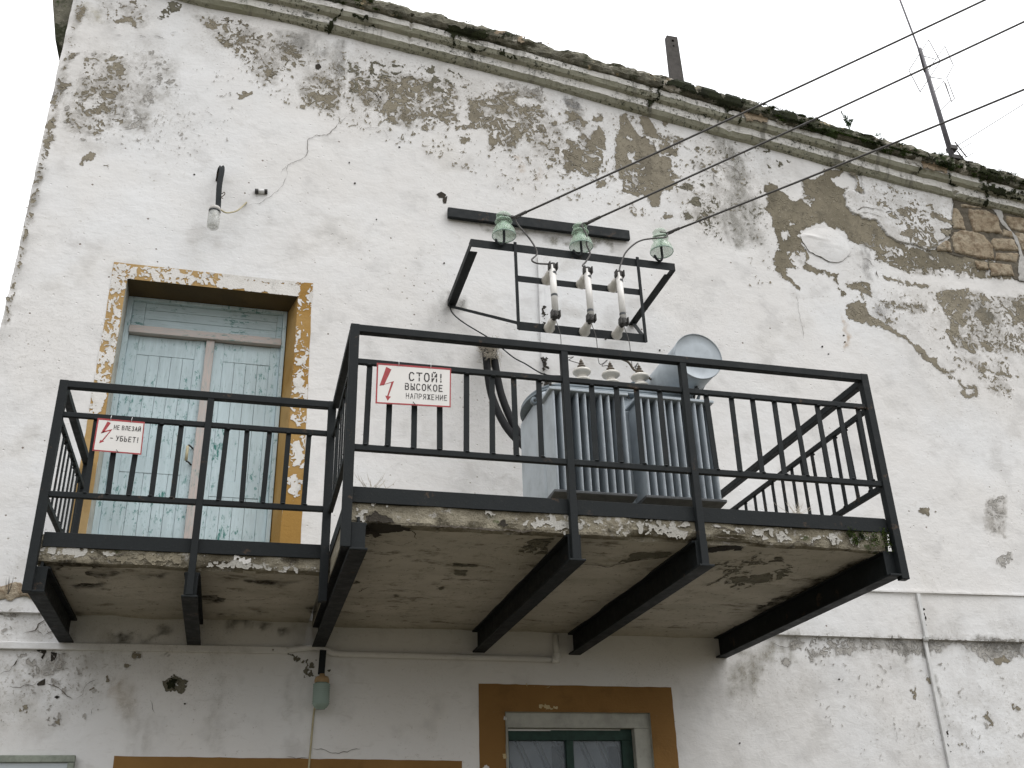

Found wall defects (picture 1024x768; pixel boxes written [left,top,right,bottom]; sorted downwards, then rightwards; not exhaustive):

peeling [5,0,212,321]
crack [250,116,347,205]
peeling [200,16,1024,399]
peeling [89,263,313,497]
peeling [199,554,317,573]
spalling [356,503,410,538]
peeling [519,513,690,555]
spalling [707,524,873,589]
peeling [12,650,110,727]
flaking render [162,674,188,694]
peeling [780,635,1024,732]
peeling [893,690,1024,753]